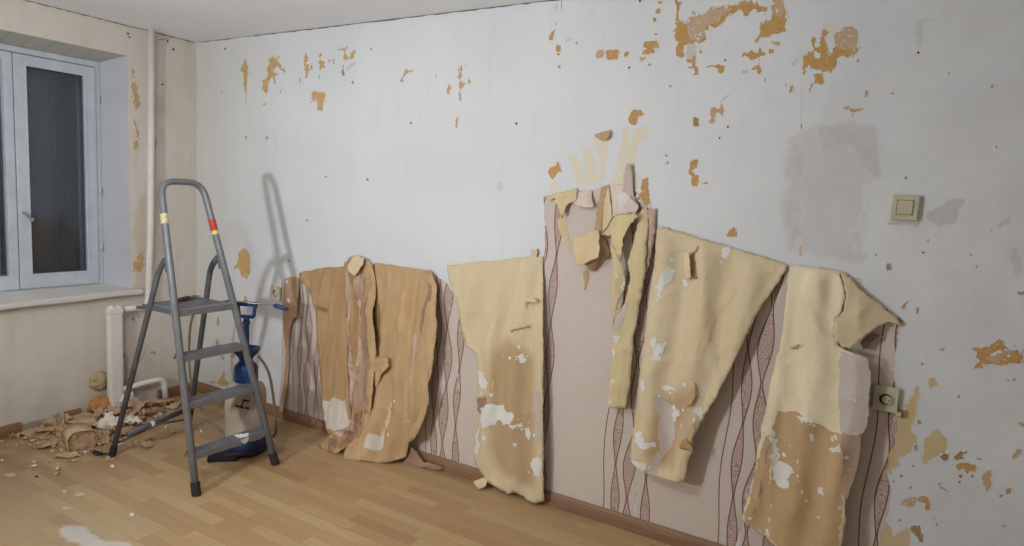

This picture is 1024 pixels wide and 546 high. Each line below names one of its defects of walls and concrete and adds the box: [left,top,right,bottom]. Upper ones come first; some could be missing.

peeling [595,0,789,83]
peeling [784,26,861,95]
peeling [240,55,285,106]
peeling [299,46,356,111]
peeling [131,65,141,150]
peeling [628,109,645,125]
peeling [547,161,563,180]
peeling [689,158,708,186]
peeling [634,177,652,208]
peeling [233,247,250,279]
peeling [972,339,1024,369]